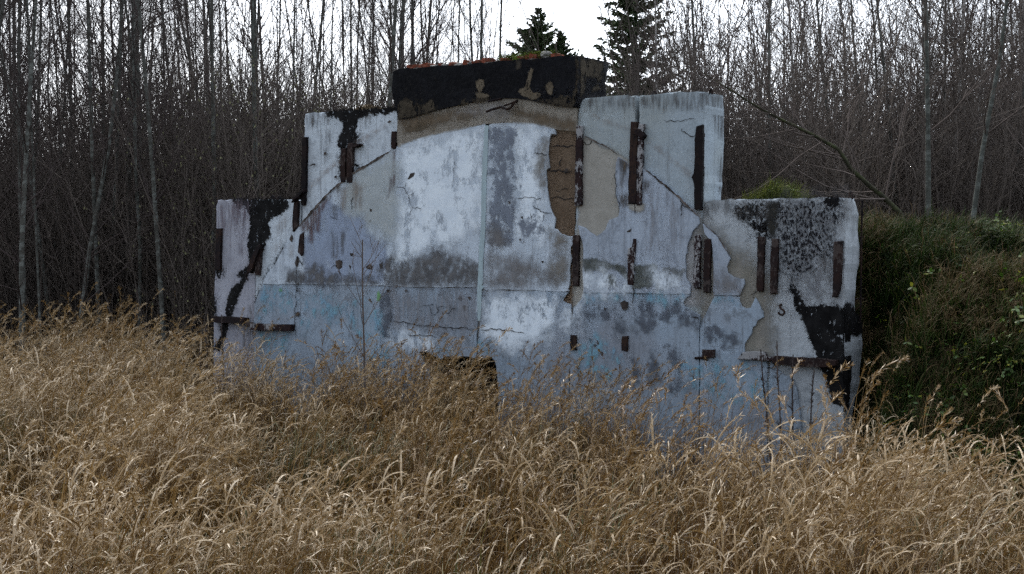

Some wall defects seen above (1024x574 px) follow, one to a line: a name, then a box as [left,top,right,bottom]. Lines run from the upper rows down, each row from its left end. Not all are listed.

water stain [211,197,289,351]
peeling [289,98,644,447]
water stain [631,344,682,392]
water stain [583,258,740,349]
flaking render [647,209,774,403]
water stain [719,187,863,412]